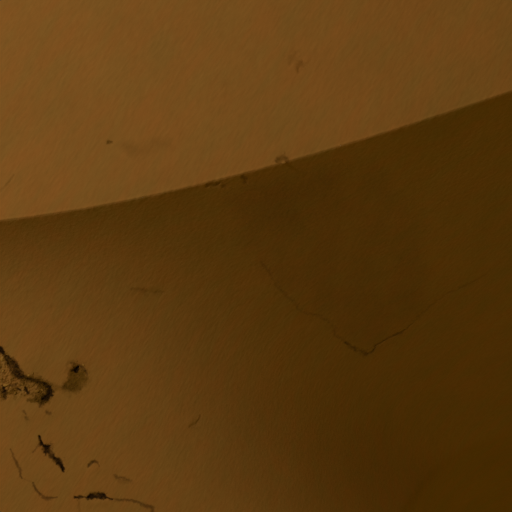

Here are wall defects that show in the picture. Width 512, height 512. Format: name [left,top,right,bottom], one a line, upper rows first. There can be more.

spalling [0,347,53,405]
crack [39,435,65,472]
crack [74,492,113,500]